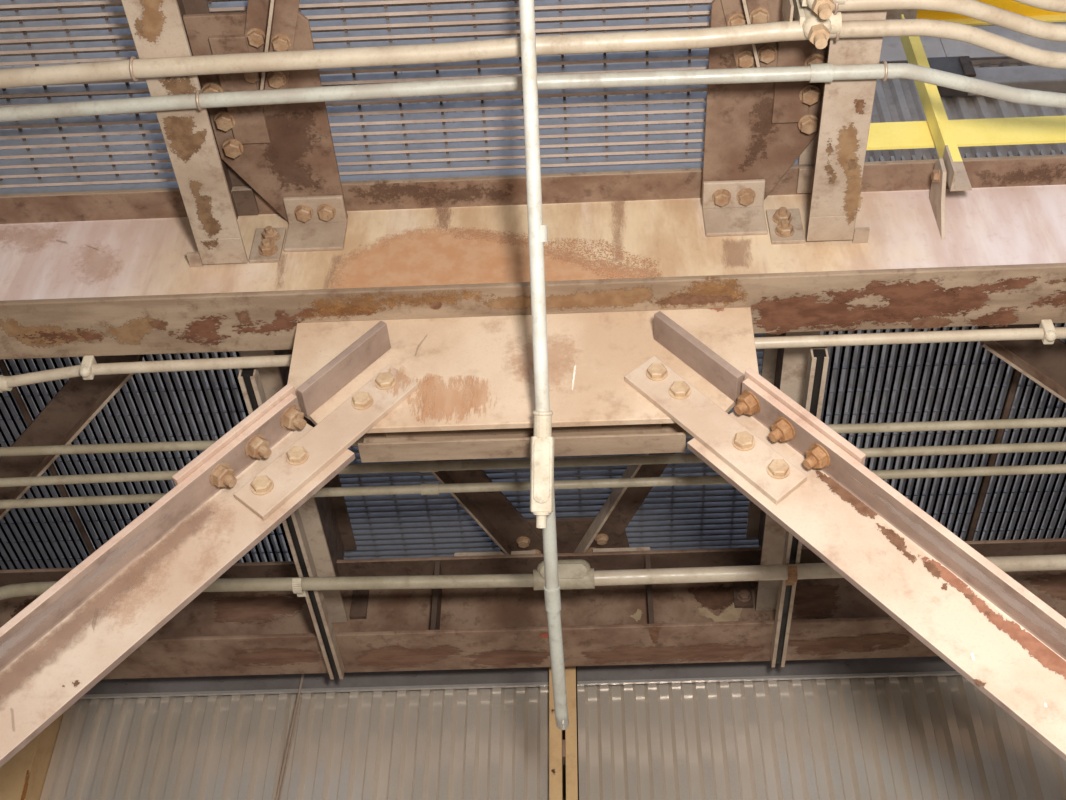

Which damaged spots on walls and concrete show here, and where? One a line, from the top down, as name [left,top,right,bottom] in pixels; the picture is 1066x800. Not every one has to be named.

rust [302,227,530,319]
rust [544,239,660,281]
peeling [816,471,1066,679]
peeling [581,643,764,664]
peeling [788,632,910,656]